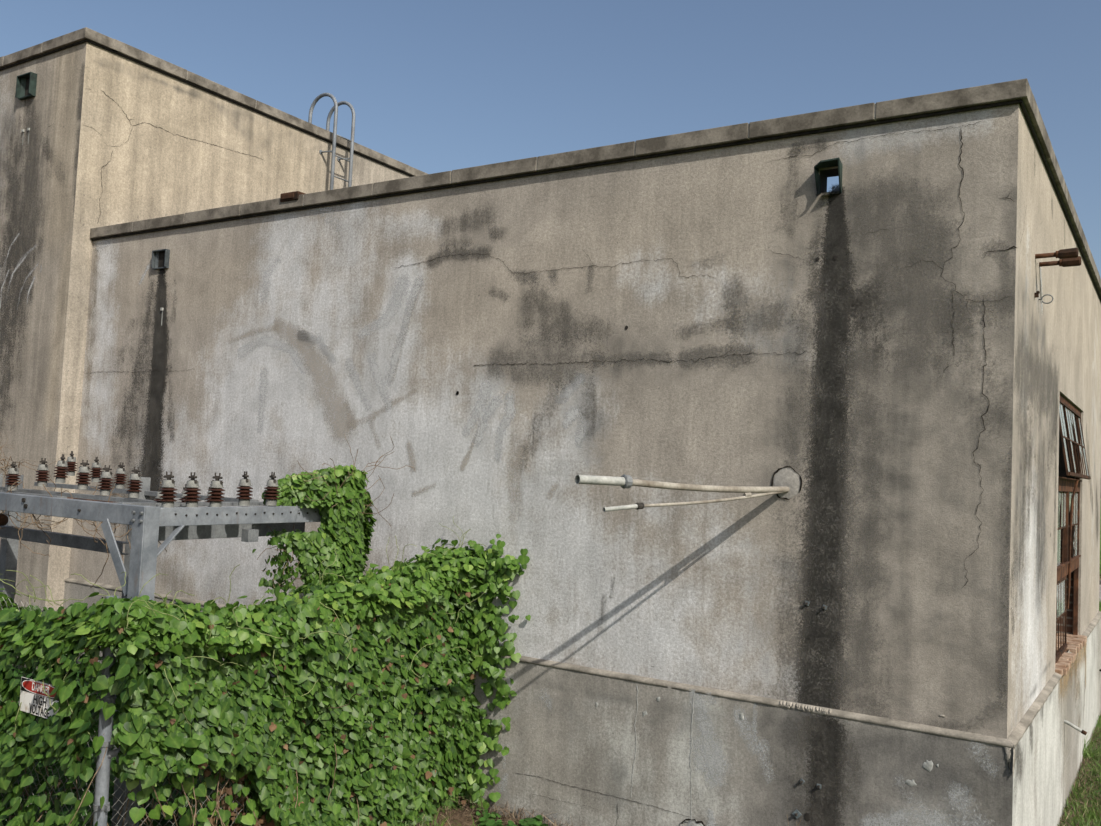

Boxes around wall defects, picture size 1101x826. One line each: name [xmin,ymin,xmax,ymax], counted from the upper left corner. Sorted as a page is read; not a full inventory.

damp [0,99,49,429]
damp [112,265,174,500]
crack [80,88,263,222]
damp [238,212,499,438]
damp [460,271,784,471]
crack [773,121,1027,588]
damp [775,177,1015,826]
damp [987,432,1057,715]
damp [1015,723,1033,781]